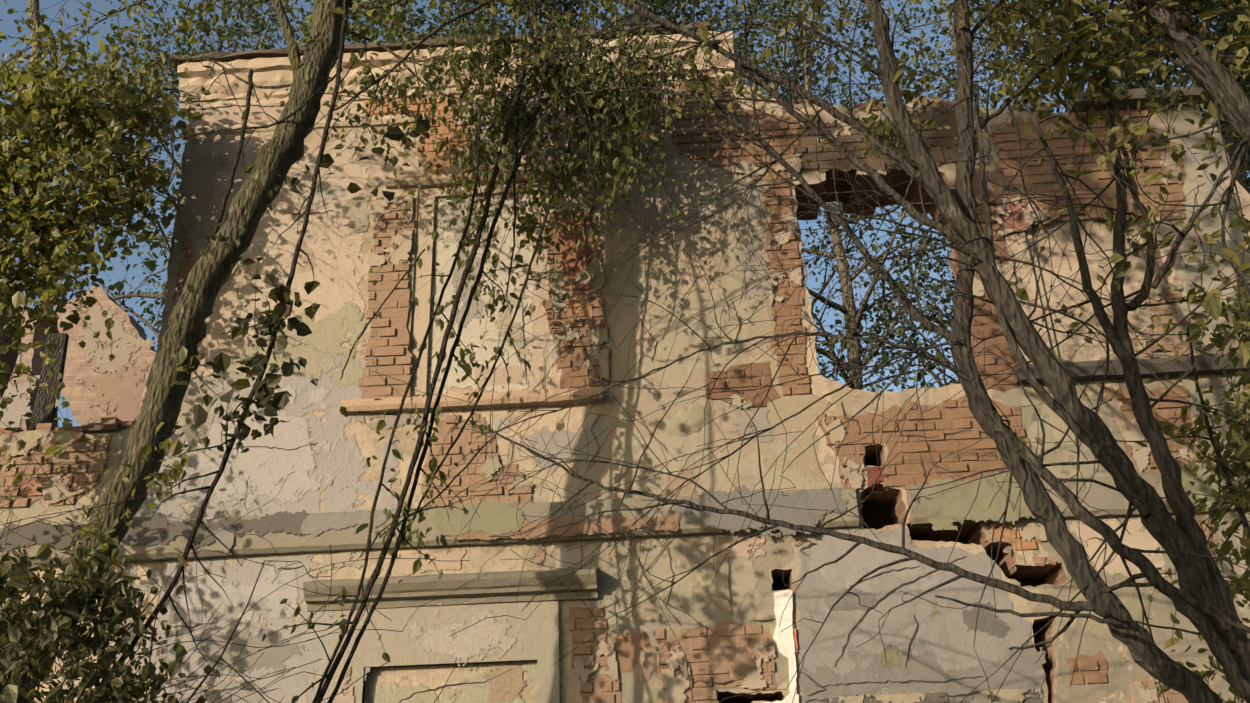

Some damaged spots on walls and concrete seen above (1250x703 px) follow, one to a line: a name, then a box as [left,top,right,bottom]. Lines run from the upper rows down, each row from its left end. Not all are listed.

flaking render [187,103,286,142]
spalling [364,91,471,176]
flaking render [222,129,721,399]
spalling [649,72,916,408]
spalling [972,108,1250,358]
spalling [0,286,154,508]
spalling [421,414,534,507]
spalling [816,395,1008,544]
flaking render [383,514,680,577]
spalling [982,519,1056,587]
spalling [569,603,622,703]
spalling [654,582,799,703]